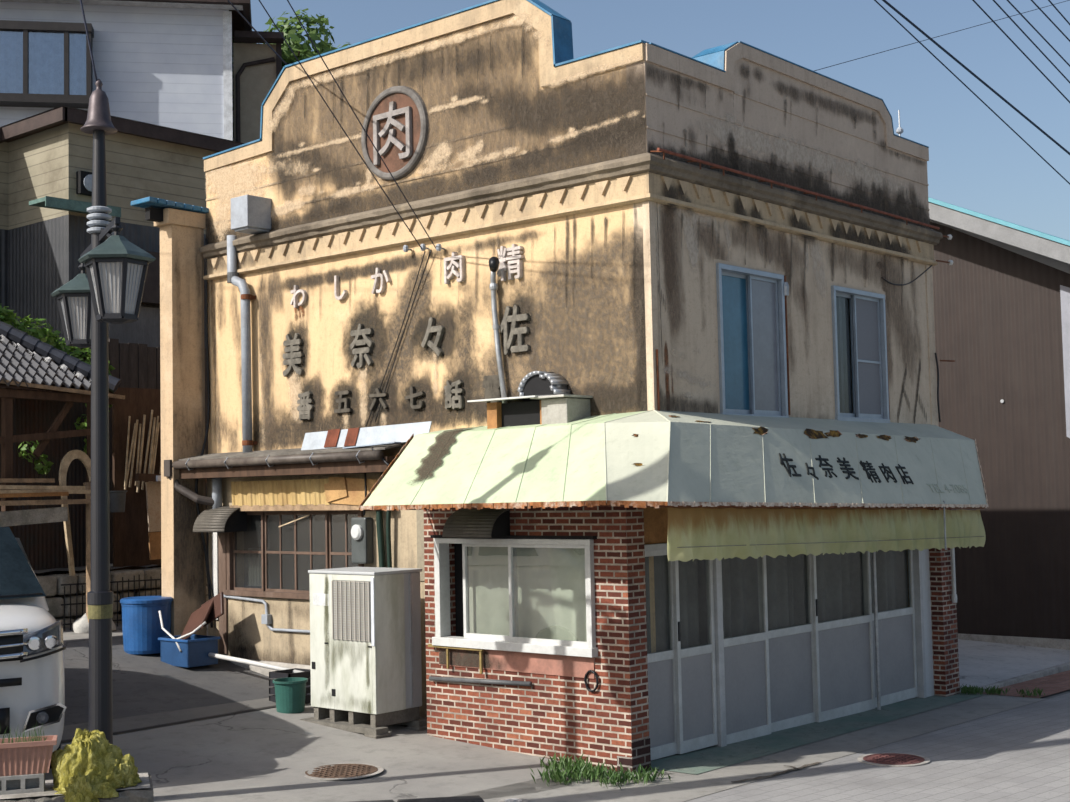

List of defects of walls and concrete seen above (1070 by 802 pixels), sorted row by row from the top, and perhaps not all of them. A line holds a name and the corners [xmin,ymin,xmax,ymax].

damp [270,18,706,219]
damp [728,135,738,174]
damp [778,84,874,128]
damp [252,205,915,450]
damp [174,476,204,594]